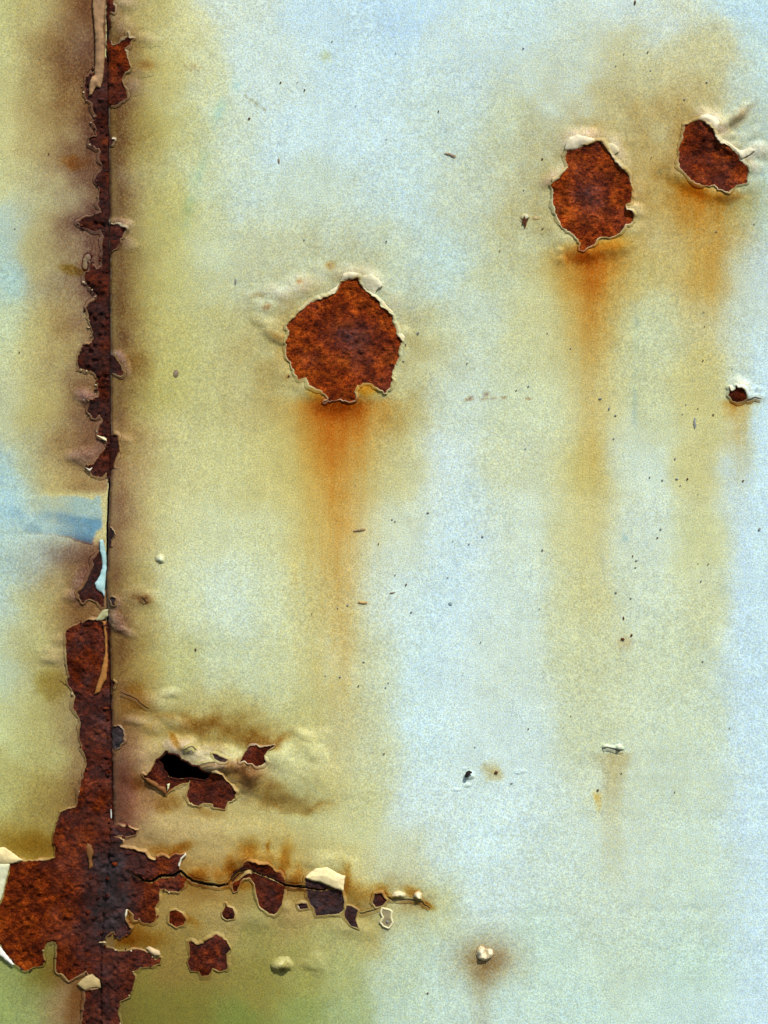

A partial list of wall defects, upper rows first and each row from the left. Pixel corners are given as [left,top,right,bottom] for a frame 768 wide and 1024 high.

peeling [548,134,637,253]
peeling [674,114,755,195]
peeling [282,272,405,406]
peeling [725,383,751,406]
peeling [0,493,394,1024]
crack [126,867,431,917]